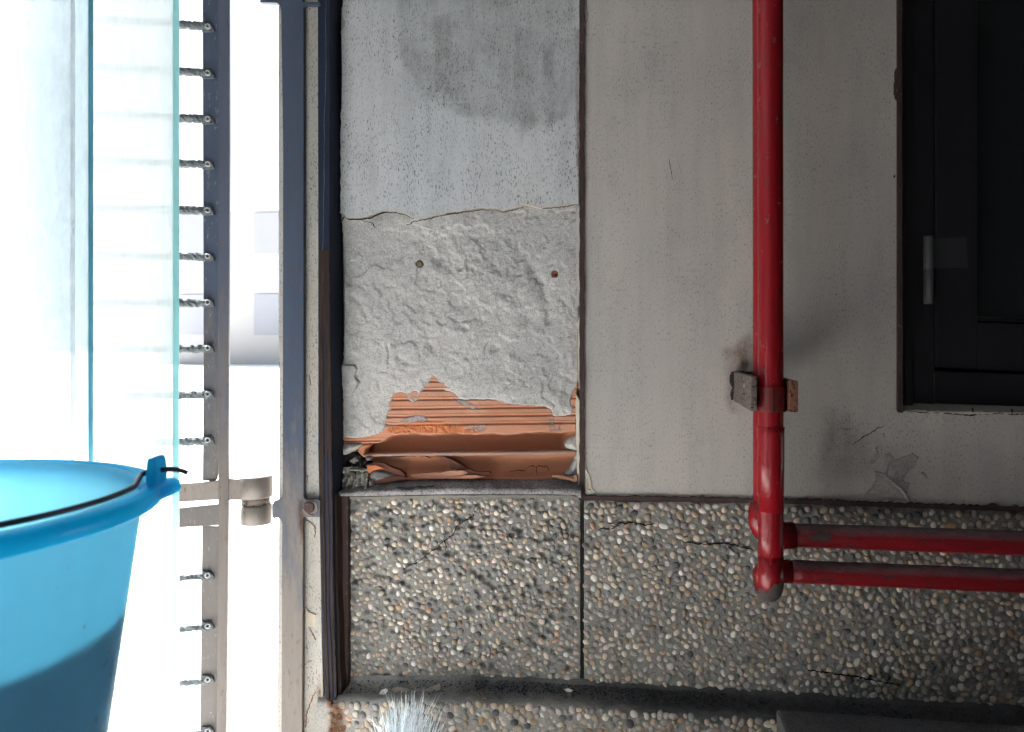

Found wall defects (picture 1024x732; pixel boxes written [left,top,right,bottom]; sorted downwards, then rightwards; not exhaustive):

crack [338,205,573,229]
spalling [340,202,597,495]
crack [601,522,652,530]
crack [405,508,478,569]
crack [683,541,753,550]